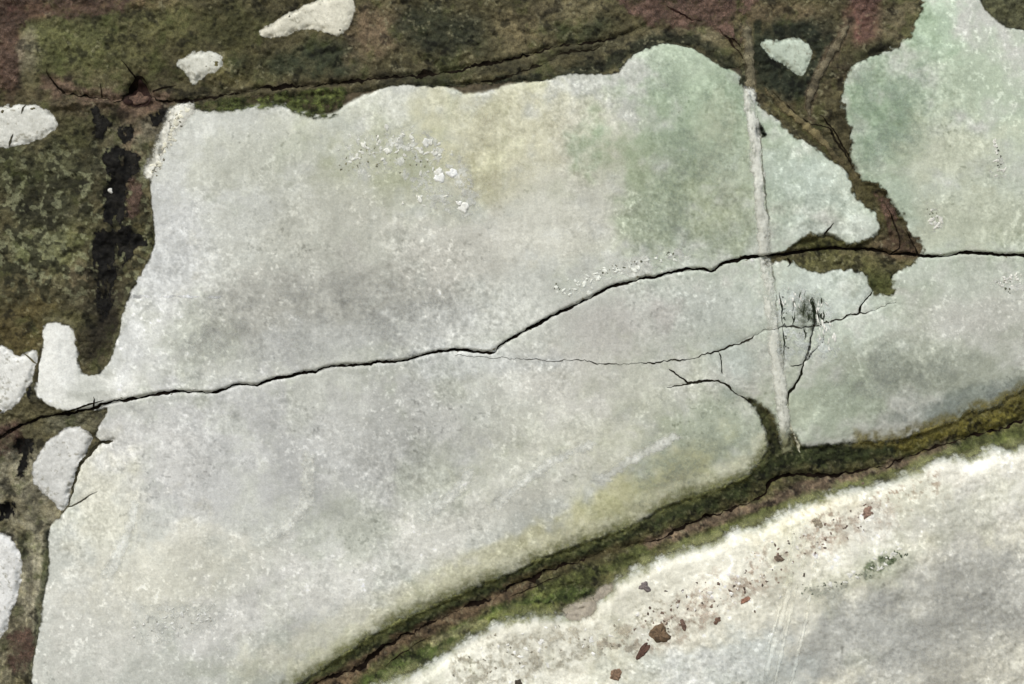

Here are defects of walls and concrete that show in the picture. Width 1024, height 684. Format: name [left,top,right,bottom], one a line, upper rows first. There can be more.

crack [46,26,645,104]
crack [0,202,1024,439]